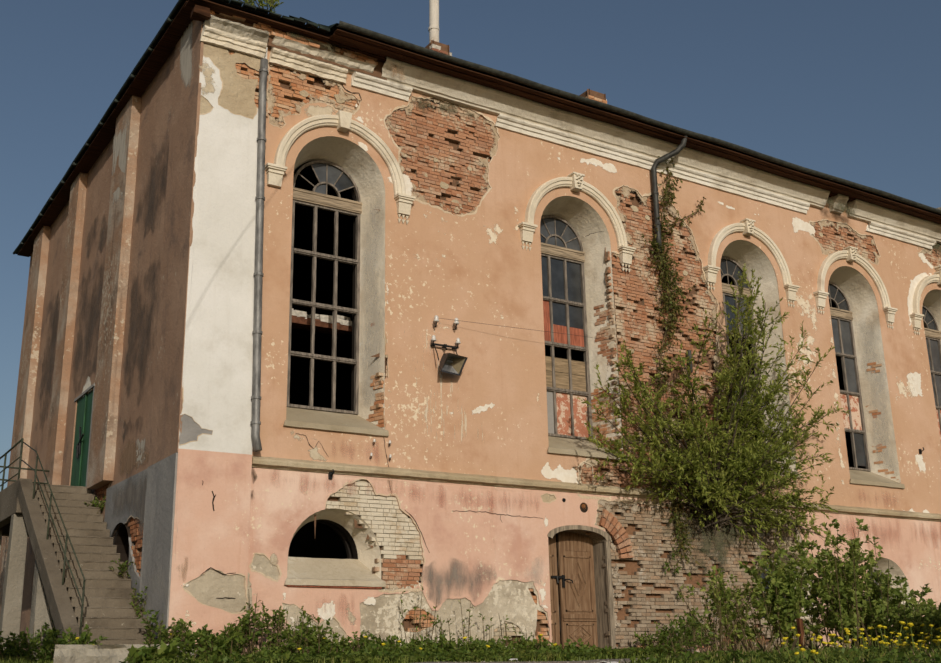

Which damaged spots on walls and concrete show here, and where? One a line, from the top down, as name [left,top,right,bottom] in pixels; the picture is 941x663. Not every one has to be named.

spalling [200,43,364,129]
spalling [208,0,387,80]
leakage [112,125,127,175]
leakage [137,159,168,228]
spalling [383,96,500,235]
leakage [42,295,59,395]
leakage [74,271,103,372]
leakage [126,283,155,393]
flaking render [179,388,213,446]
spalling [541,185,819,650]
flaking render [181,553,282,614]
flaking render [282,478,553,651]